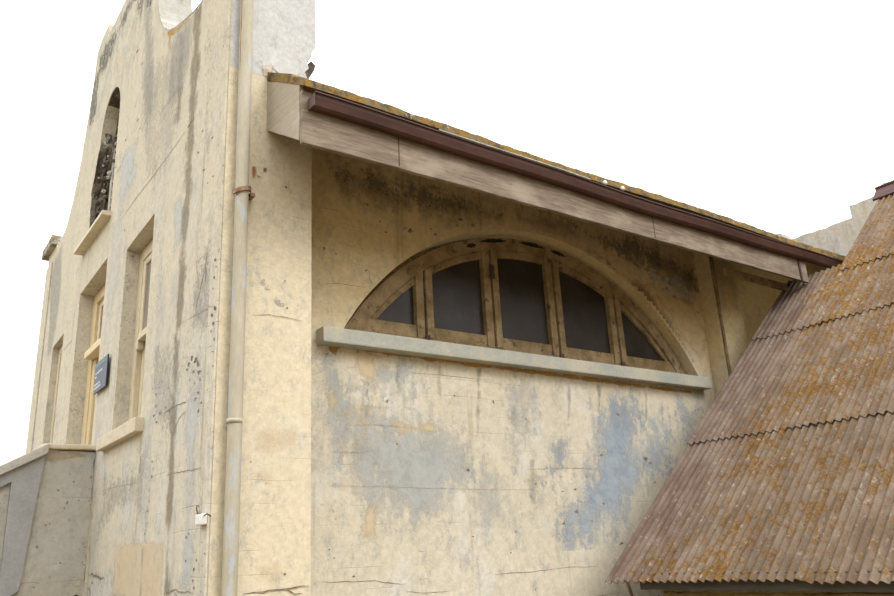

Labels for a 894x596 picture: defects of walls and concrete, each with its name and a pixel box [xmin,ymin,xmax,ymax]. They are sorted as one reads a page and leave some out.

water stain [89,0,152,127]
water stain [170,5,201,241]
water stain [174,258,185,378]
crack [181,251,217,324]
water stain [167,399,176,525]